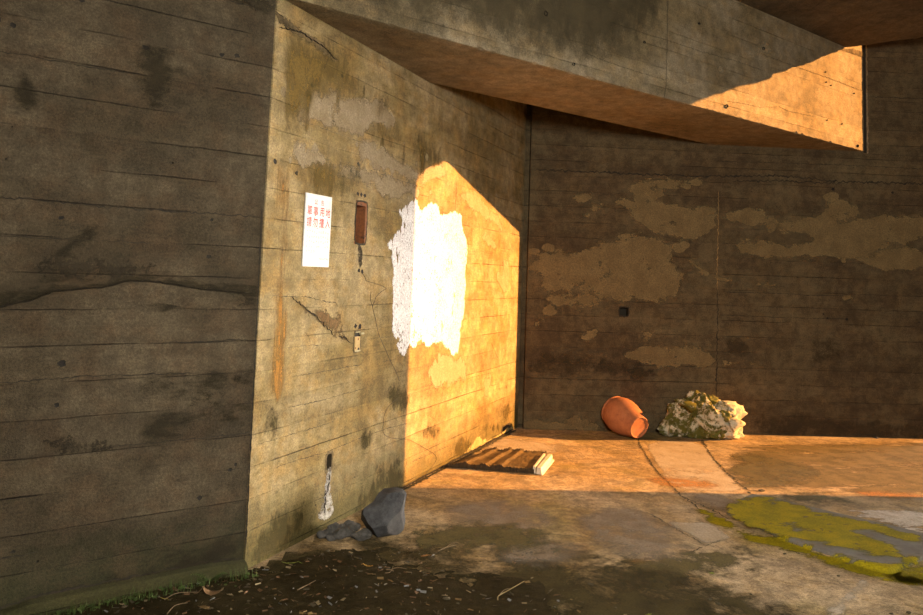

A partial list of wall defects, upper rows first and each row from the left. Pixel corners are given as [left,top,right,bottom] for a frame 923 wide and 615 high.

peeling [528,176,923,327]
crack [0,279,247,308]
corrosion [272,284,286,401]
spalling [292,297,351,343]
peeling [624,331,737,369]
crack [637,438,728,519]
crack [701,440,759,492]
crack [649,513,722,553]